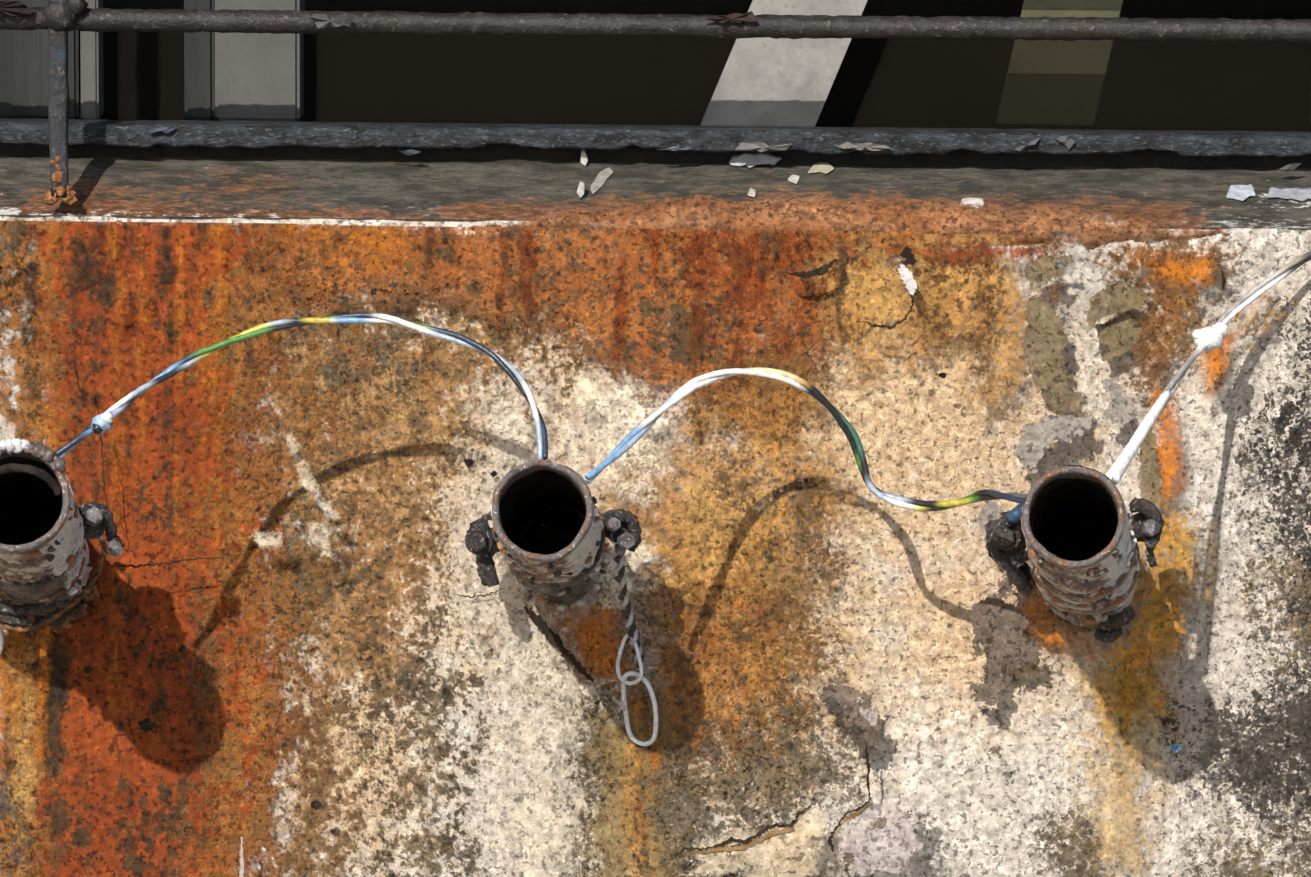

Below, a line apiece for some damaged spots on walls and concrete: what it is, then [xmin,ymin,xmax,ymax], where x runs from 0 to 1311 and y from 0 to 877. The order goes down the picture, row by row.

corrosion [0,221,1073,877]
crack [674,745,872,856]
corrosion [1022,235,1297,746]
water stain [1151,297,1311,877]